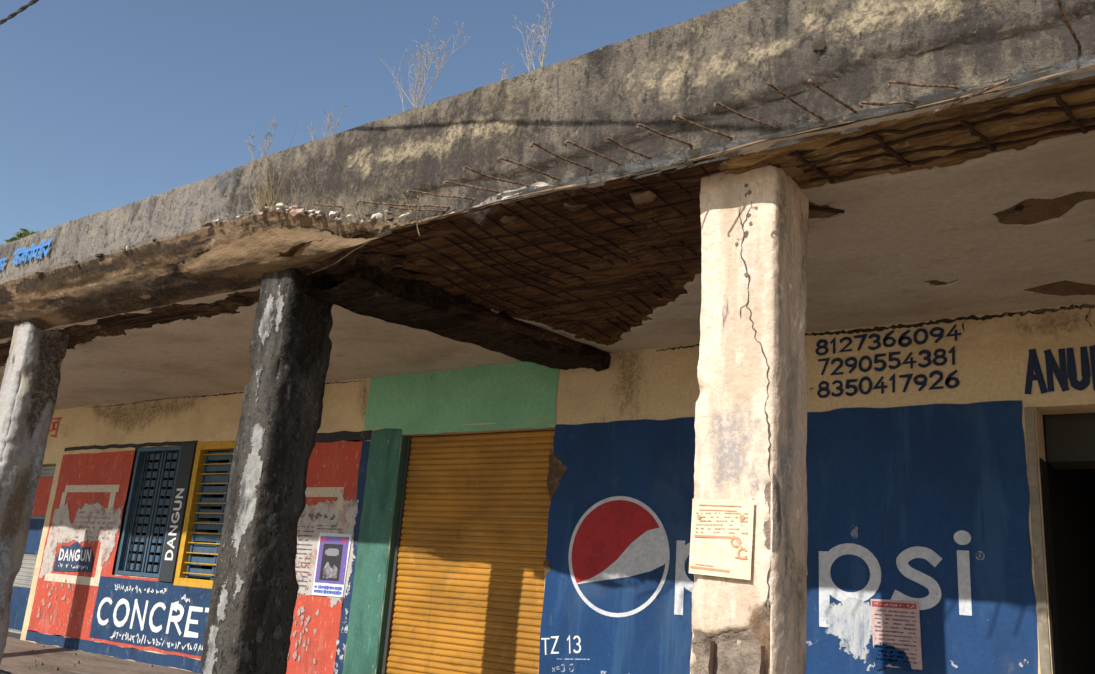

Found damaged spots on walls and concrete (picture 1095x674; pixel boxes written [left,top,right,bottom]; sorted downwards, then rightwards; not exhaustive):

damp [216,56,894,220]
spalling [202,0,1095,346]
spalling [0,335,12,366]
damp [0,318,67,437]
spalling [51,283,284,349]
crack [735,184,771,478]
peeling [231,423,265,558]
spalling [763,473,782,552]
peeling [202,565,282,674]
peeling [333,559,353,674]
crack [764,559,772,606]
peeling [806,597,874,671]